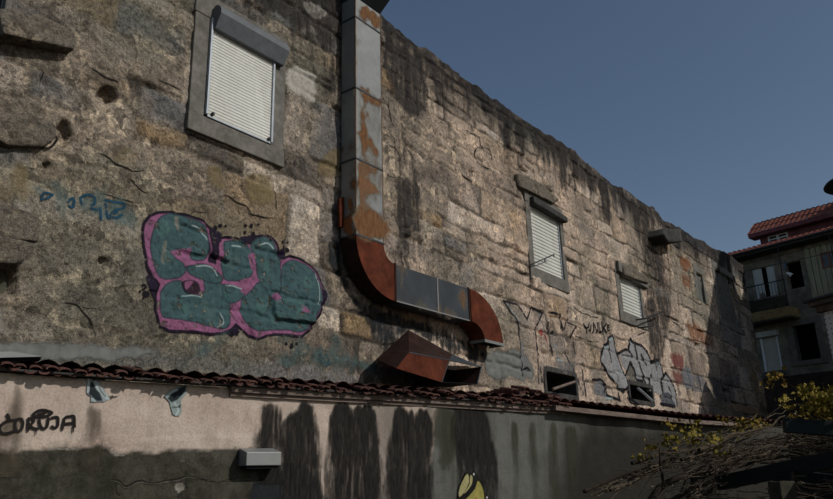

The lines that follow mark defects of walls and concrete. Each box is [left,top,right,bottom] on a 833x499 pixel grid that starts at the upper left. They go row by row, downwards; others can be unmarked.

water stain [383,44,436,116]
corrosion [337,87,390,241]
water stain [395,163,420,269]
water stain [251,402,498,499]